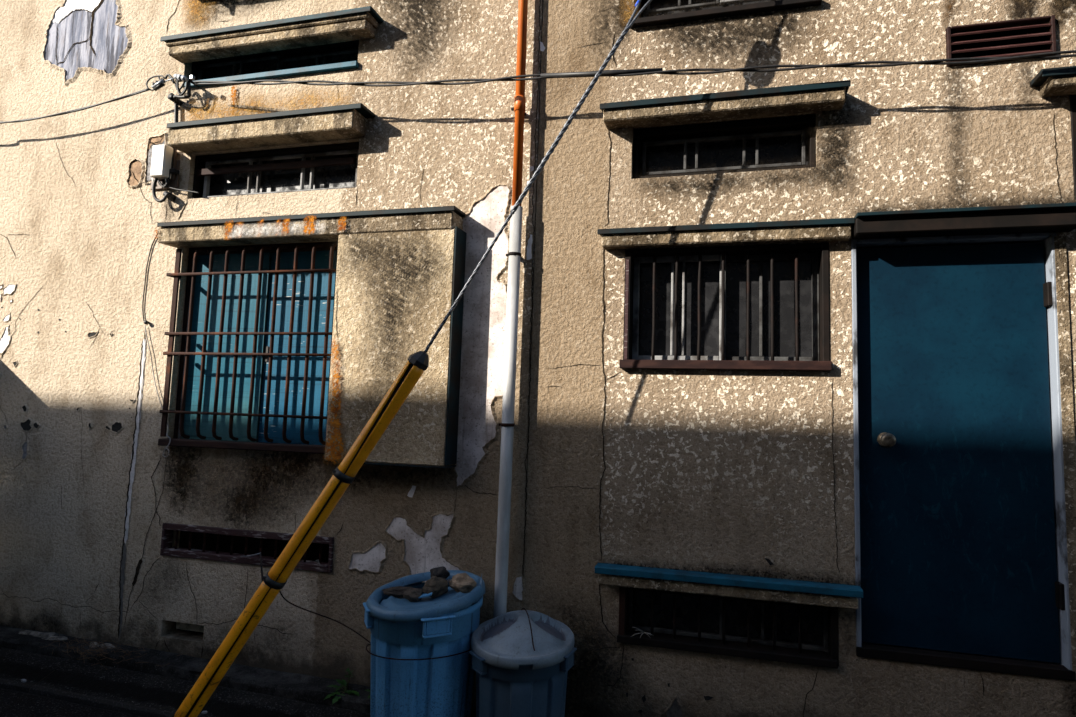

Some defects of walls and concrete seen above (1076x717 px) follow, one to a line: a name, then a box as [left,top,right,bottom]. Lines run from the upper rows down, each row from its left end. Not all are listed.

spalling [42,0,133,87]
leakage [1008,0,1038,20]
leakage [1052,0,1076,25]
spalling [126,132,184,189]
rust [225,221,243,239]
rust [303,216,316,234]
spalling [452,183,512,489]
rust [324,340,344,463]
crack [2,332,170,652]
leakage [164,446,332,525]
spalling [347,511,463,583]
crack [186,563,288,658]